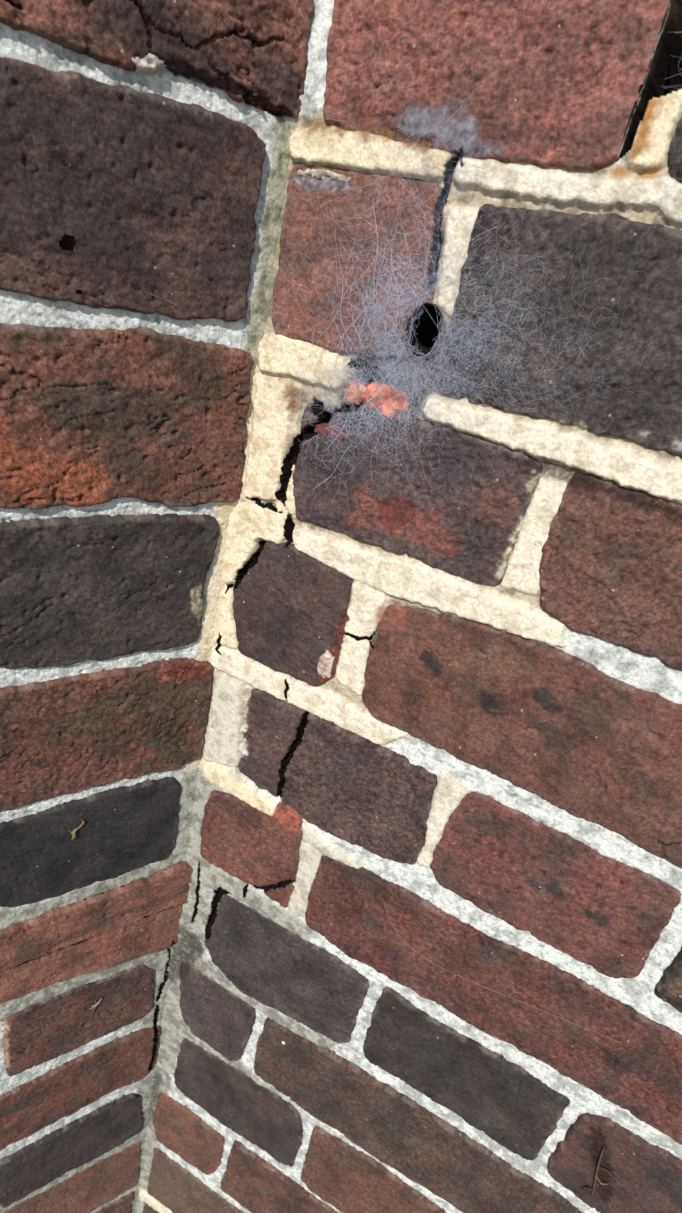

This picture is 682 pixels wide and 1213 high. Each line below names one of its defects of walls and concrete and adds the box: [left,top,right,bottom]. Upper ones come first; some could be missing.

crack [134,0,292,115]
spalling [619,0,682,158]
crack [428,152,463,292]
crack [225,373,376,594]
crack [214,633,222,655]
crack [277,678,309,799]
crack [0,861,296,1078]